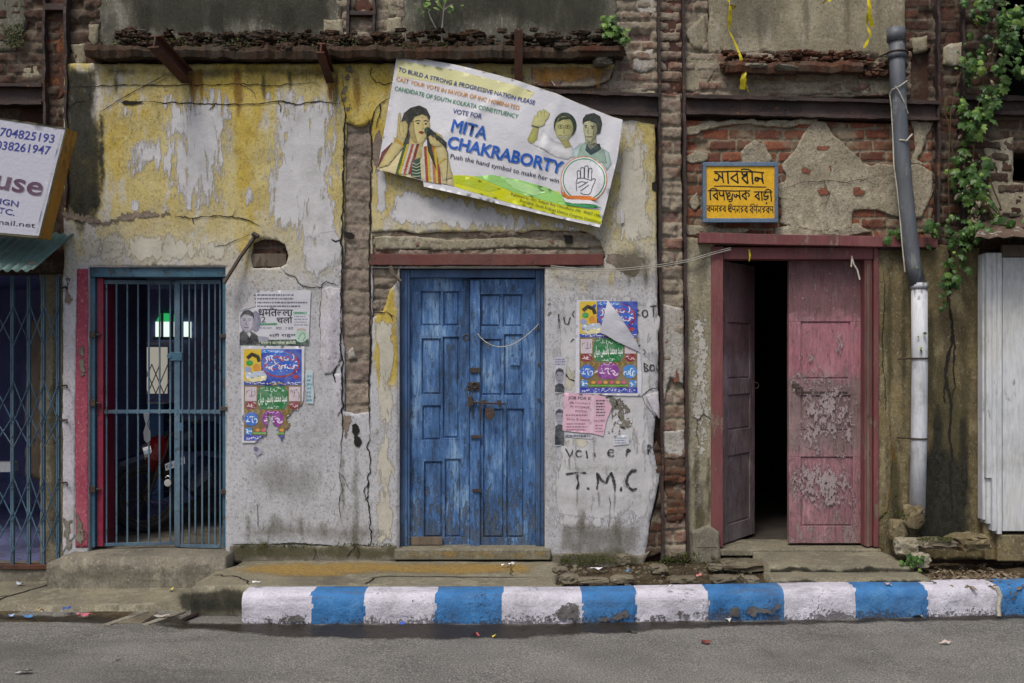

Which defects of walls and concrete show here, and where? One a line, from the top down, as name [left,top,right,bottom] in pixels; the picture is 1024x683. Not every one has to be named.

leakage [63,67,105,231]
peeling [62,200,230,263]
peeling [128,88,231,210]
crack [67,68,393,584]
peeling [252,65,901,560]
spalling [908,125,933,237]
leakage [916,322,971,537]
crack [943,250,956,511]